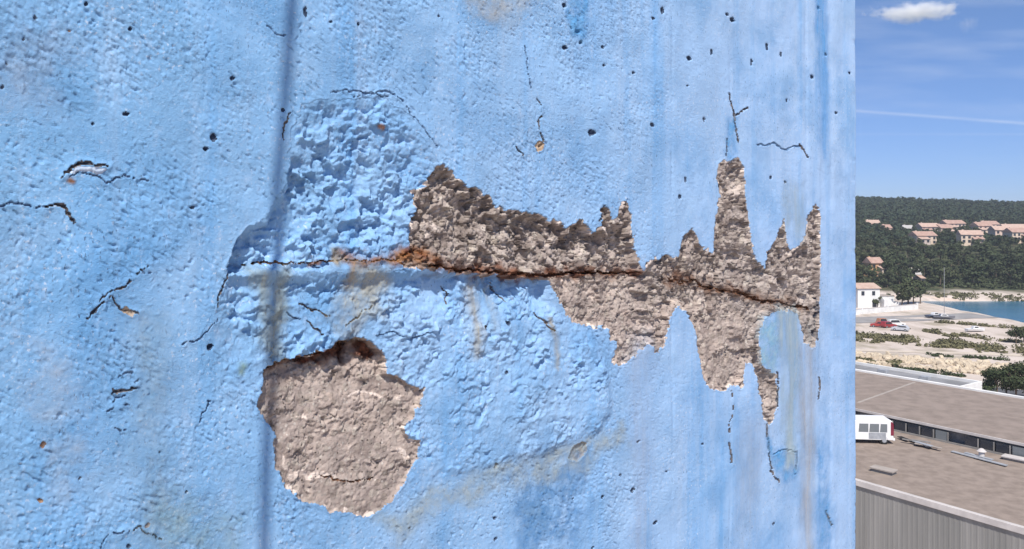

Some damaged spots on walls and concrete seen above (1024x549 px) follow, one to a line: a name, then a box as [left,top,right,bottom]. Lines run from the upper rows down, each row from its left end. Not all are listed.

crack [330,88,439,148]
crack [725,94,809,158]
crack [61,160,149,184]
crack [0,201,76,224]
crack [86,265,151,320]
crack [182,258,405,346]
corrosion [340,249,595,280]
spalling [227,96,821,425]
spalling [257,337,426,518]
crack [727,391,735,463]